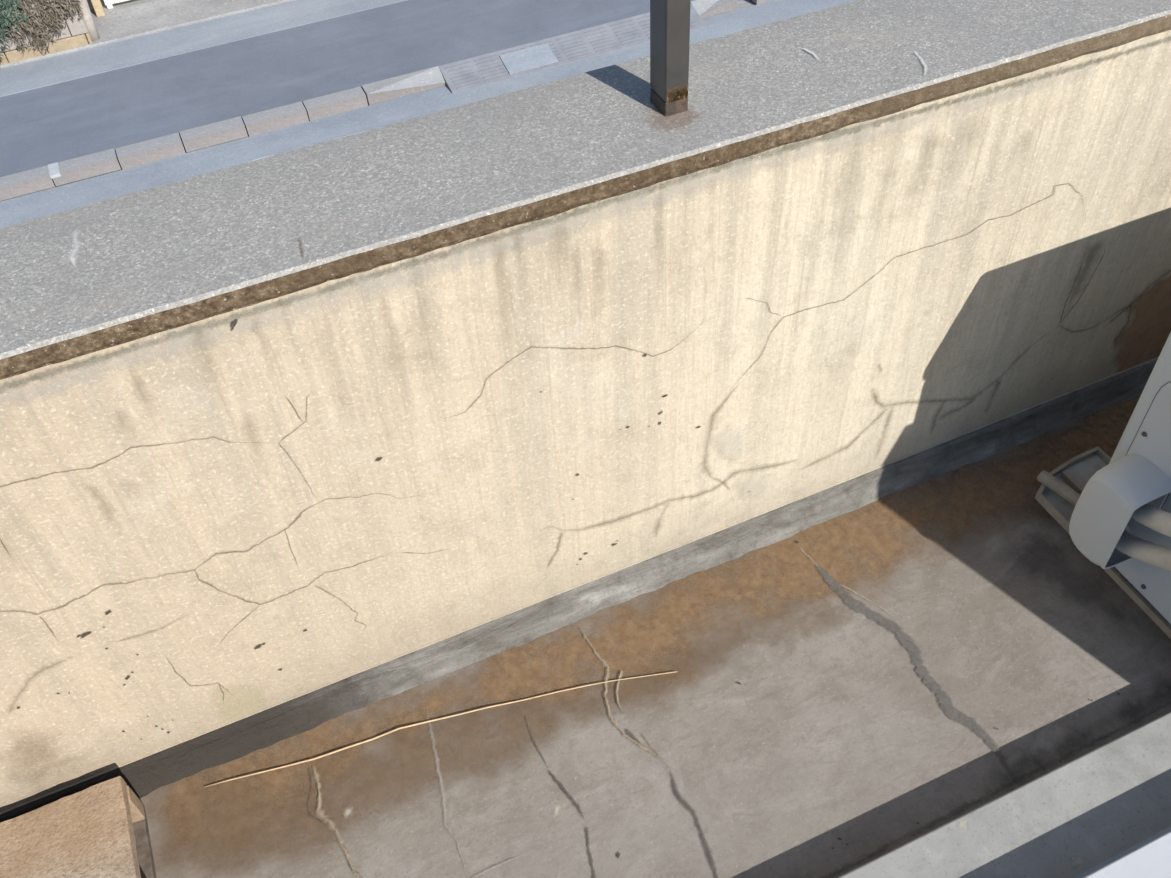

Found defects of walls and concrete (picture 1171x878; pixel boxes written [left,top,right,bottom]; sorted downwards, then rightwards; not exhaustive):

rust [667,87,688,103]
crack [561,343,680,356]
crack [1,444,160,487]
crack [17,581,134,635]
crack [188,495,366,637]
crack [800,548,1000,754]
crack [307,769,359,875]
crack [527,724,595,878]
crack [583,633,717,878]